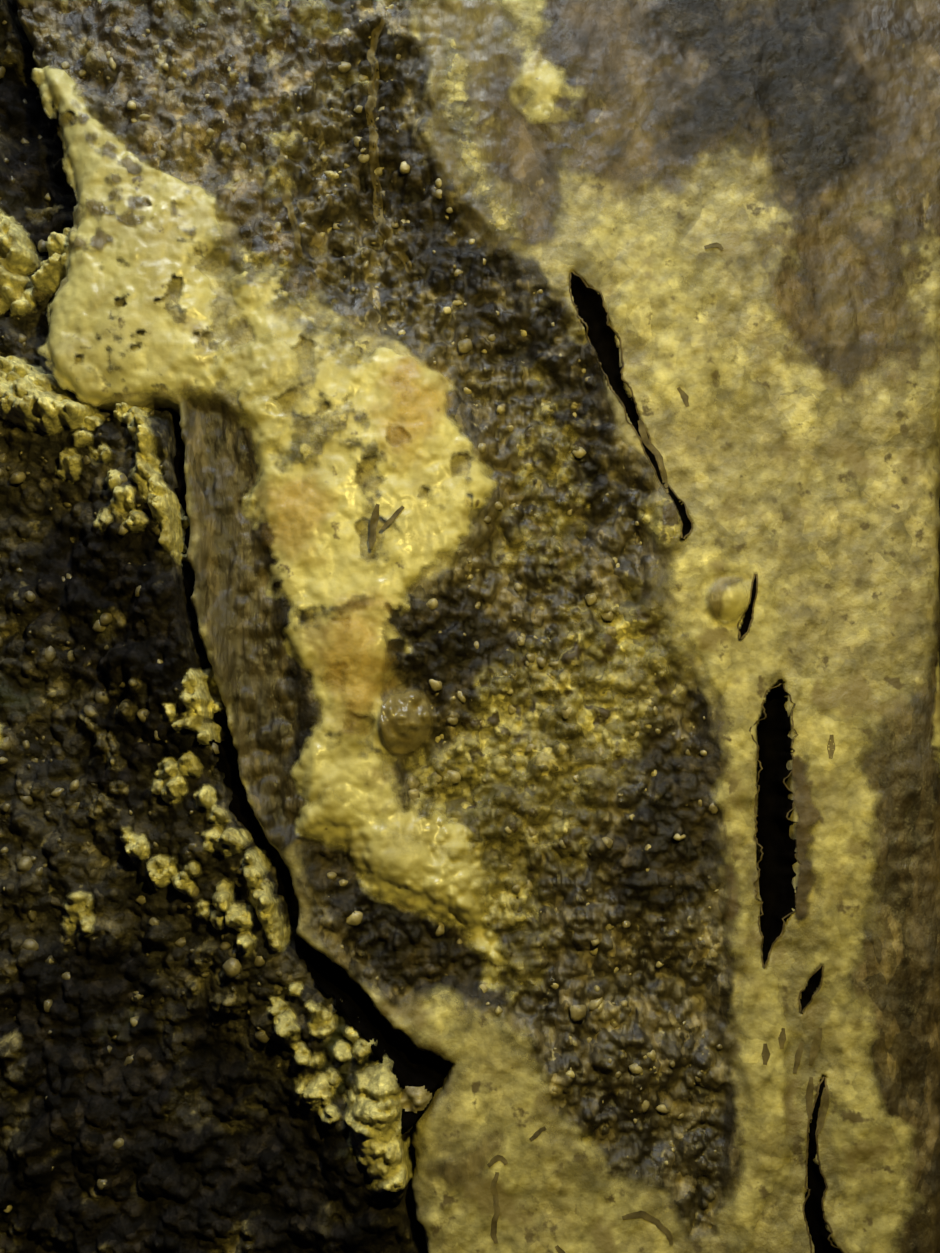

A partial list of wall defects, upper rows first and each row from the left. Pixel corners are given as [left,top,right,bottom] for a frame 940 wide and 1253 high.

damp [240,0,282,37]
spalling [0,0,674,718]
crack [569,271,693,539]
damp [335,0,940,578]
spalling [130,924,282,1027]
crack [209,711,292,900]
damp [0,39,674,1253]
spalling [373,619,483,823]
spalling [297,655,743,1239]
damp [408,536,797,1253]
crack [749,683,835,967]
crack [761,965,844,1253]